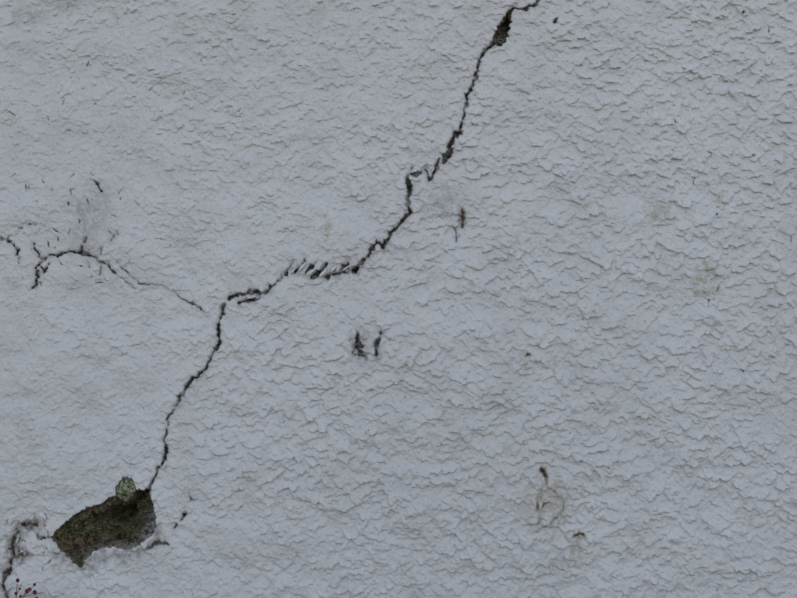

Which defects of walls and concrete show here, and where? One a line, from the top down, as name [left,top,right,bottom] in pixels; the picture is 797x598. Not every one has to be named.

crack [1,238,150,289]
crack [149,0,539,490]
crack [2,520,38,598]
spalling [37,476,157,570]